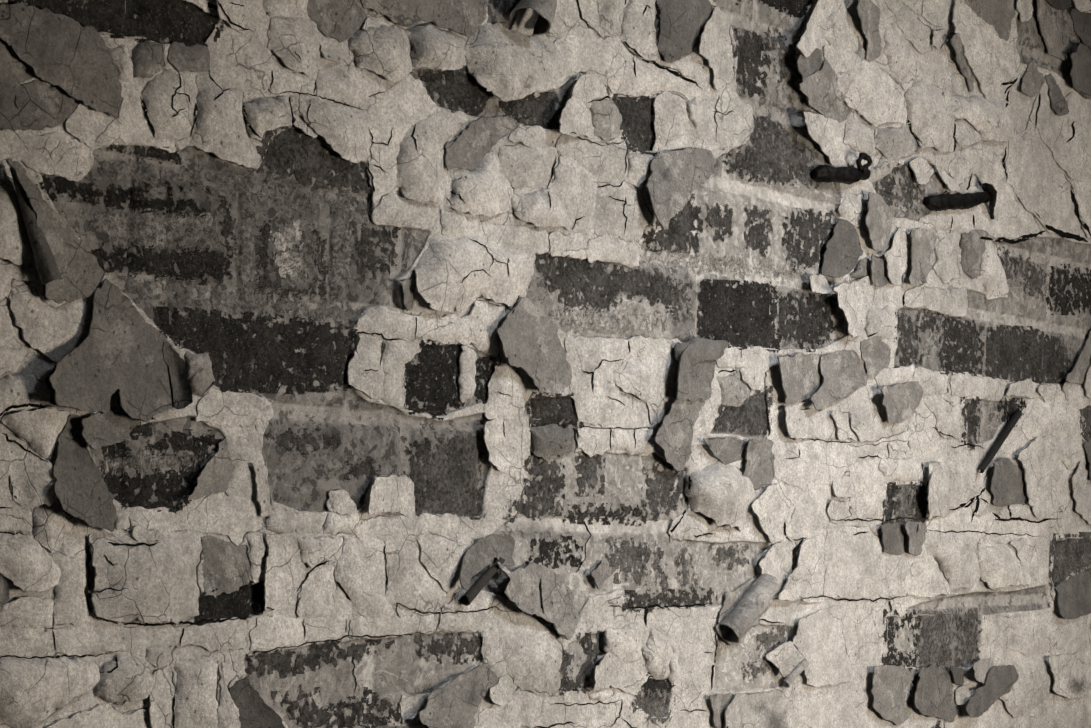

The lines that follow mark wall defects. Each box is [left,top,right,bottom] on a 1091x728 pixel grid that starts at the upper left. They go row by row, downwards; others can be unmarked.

crack [624,0,734,134]
crack [270,71,418,213]
peeling [782,0,1091,316]
crack [944,172,1091,244]
crack [573,341,652,449]
peeling [703,286,1091,728]
crack [0,627,126,673]
crack [84,536,515,692]
peeling [280,664,544,728]
crack [534,700,637,728]
peeling [559,622,681,724]
crack [610,603,712,626]